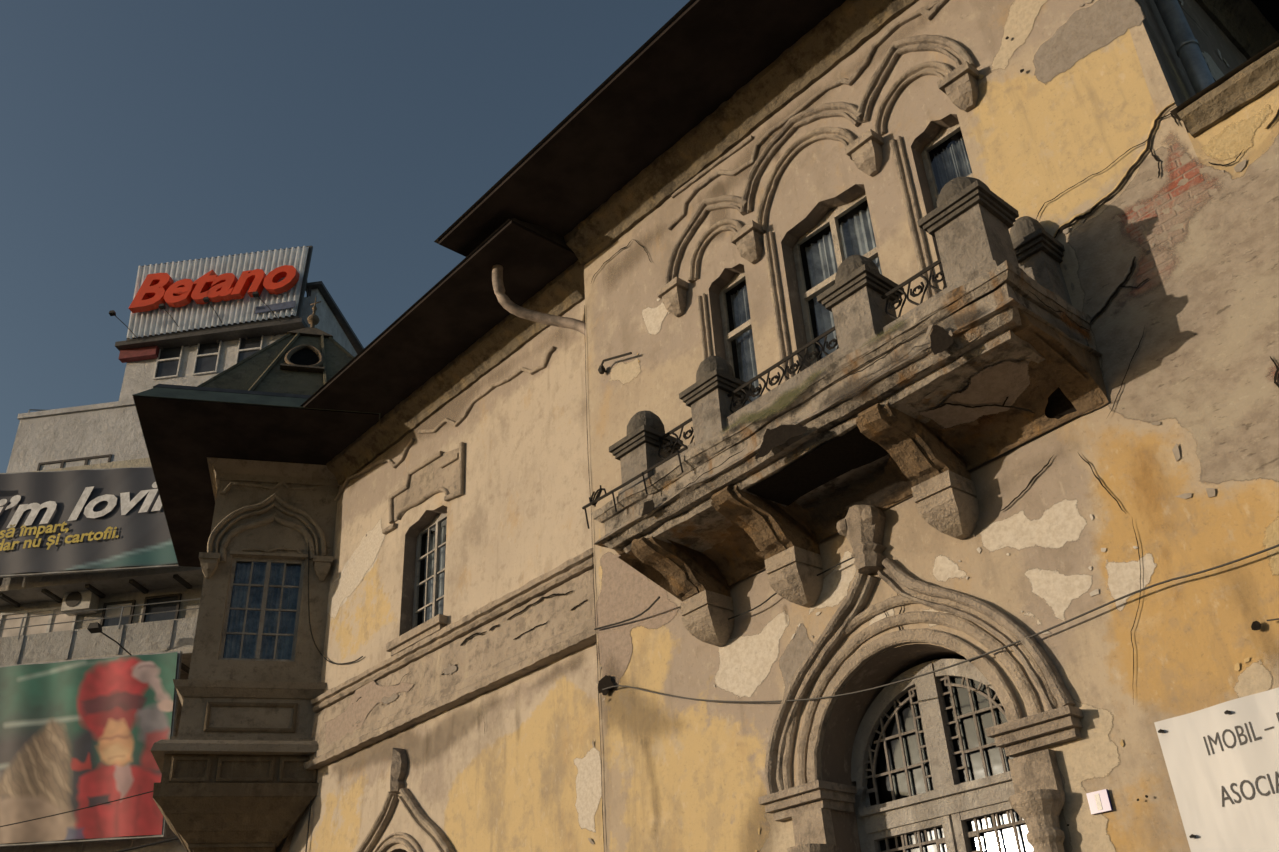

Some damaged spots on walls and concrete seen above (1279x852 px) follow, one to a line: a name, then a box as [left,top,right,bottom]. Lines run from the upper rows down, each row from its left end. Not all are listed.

peeling [1033,0,1144,83]
crack [1036,102,1179,238]
crack [1209,107,1279,166]
crack [840,332,924,381]
crack [1026,256,1149,331]
flaking render [1063,134,1279,499]
crack [930,397,1034,413]
peeling [973,499,1093,556]
peeling [714,550,857,698]
crack [1001,453,1141,700]
peeling [1025,546,1157,622]
peeling [574,741,602,844]